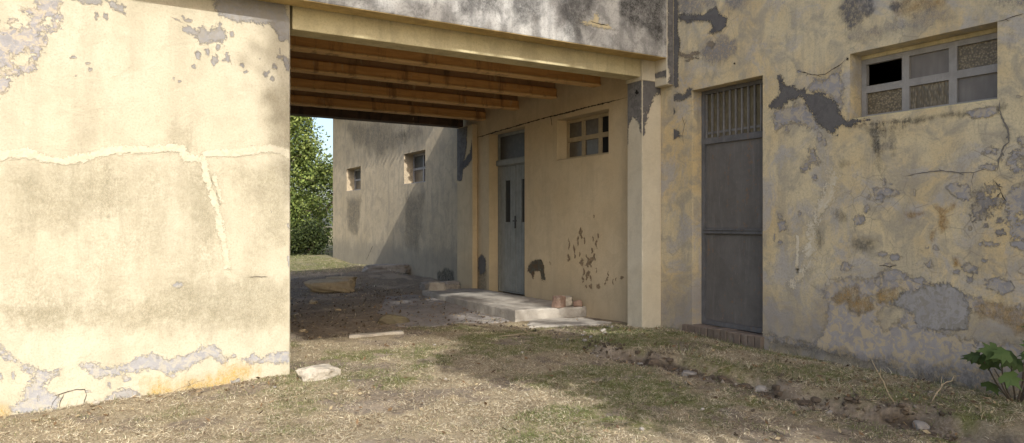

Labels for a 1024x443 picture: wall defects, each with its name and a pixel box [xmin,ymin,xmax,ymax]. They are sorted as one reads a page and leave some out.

peeling [0,0,127,94]
peeling [172,0,289,81]
flaking render [628,0,728,136]
flaking render [768,57,872,181]
crack [903,103,1010,202]
peeling [528,259,551,281]
peeling [567,227,624,289]
peeling [764,136,1024,399]
peeling [0,343,64,414]
peeling [78,344,289,393]